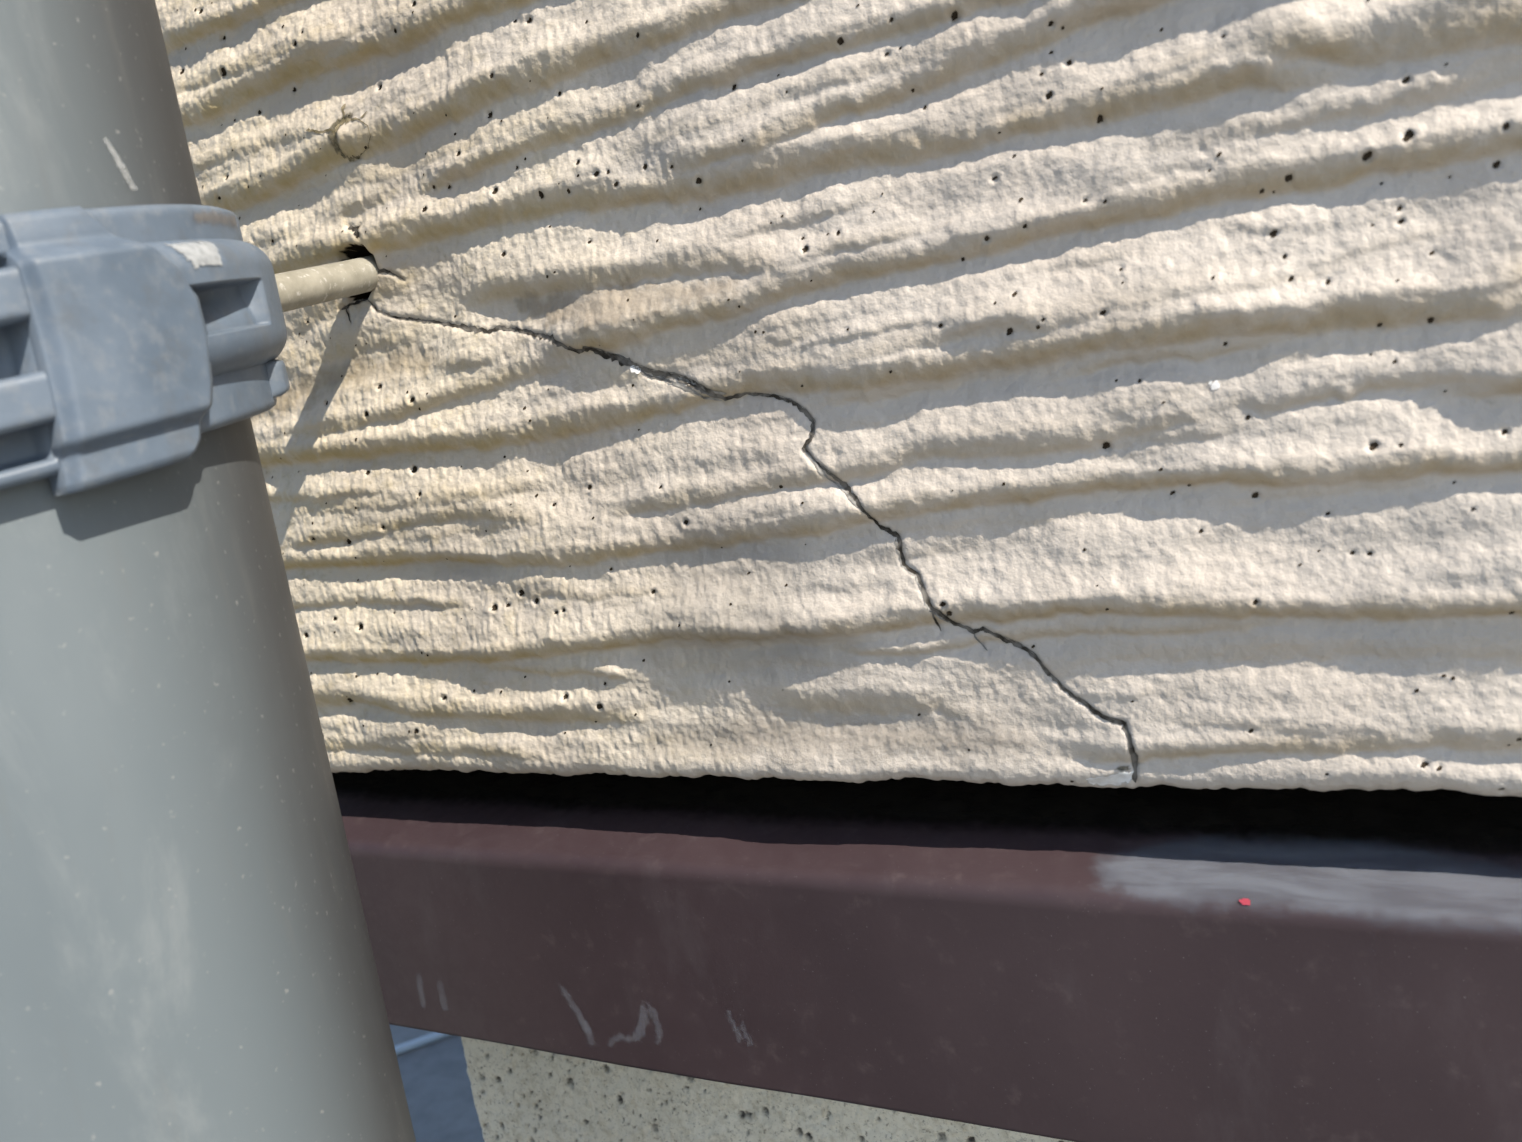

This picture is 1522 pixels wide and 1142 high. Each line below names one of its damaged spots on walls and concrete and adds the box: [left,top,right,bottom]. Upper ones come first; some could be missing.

crack [368,300,1138,783]